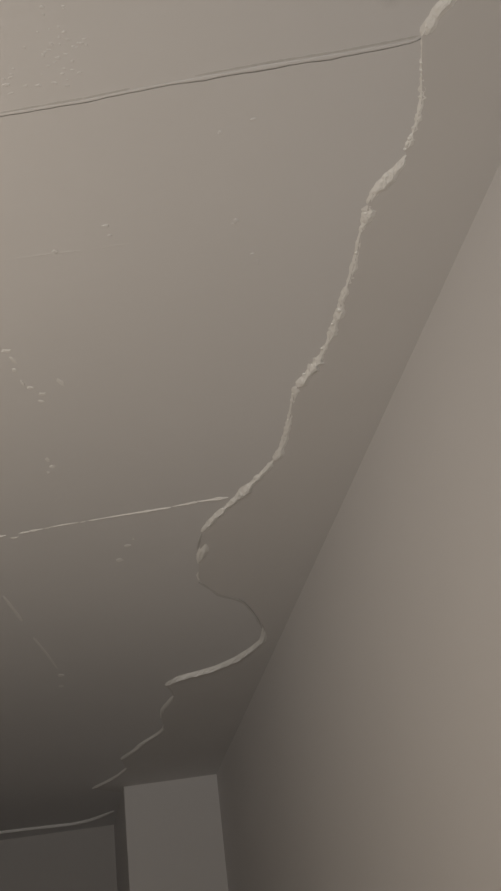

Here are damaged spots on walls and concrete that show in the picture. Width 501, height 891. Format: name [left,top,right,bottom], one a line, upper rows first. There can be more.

crack [0,0,457,760]
crack [92,768,127,789]